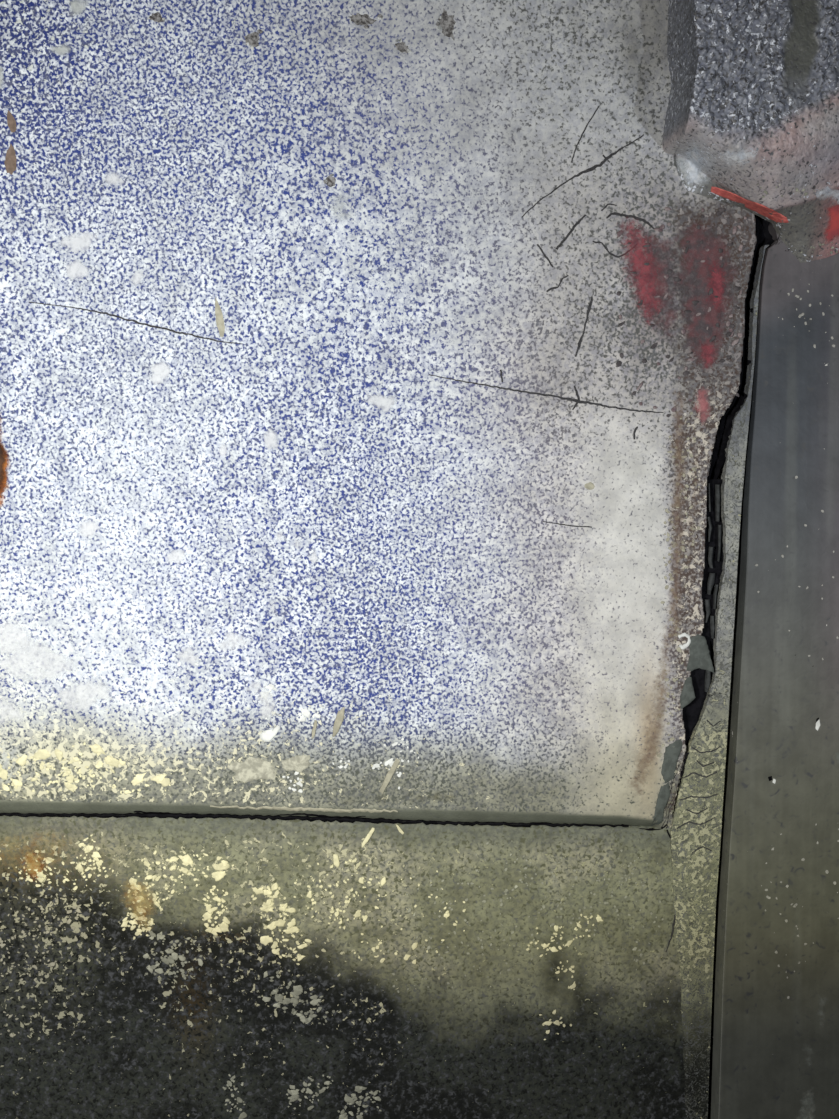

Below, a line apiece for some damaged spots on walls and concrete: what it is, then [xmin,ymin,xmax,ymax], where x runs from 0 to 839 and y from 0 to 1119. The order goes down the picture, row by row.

crack [522,106,644,217]
peeling [641,339,695,380]
peeling [684,286,743,363]
corrosion [0,440,8,505]
crack [0,203,775,853]
spalling [631,382,722,826]